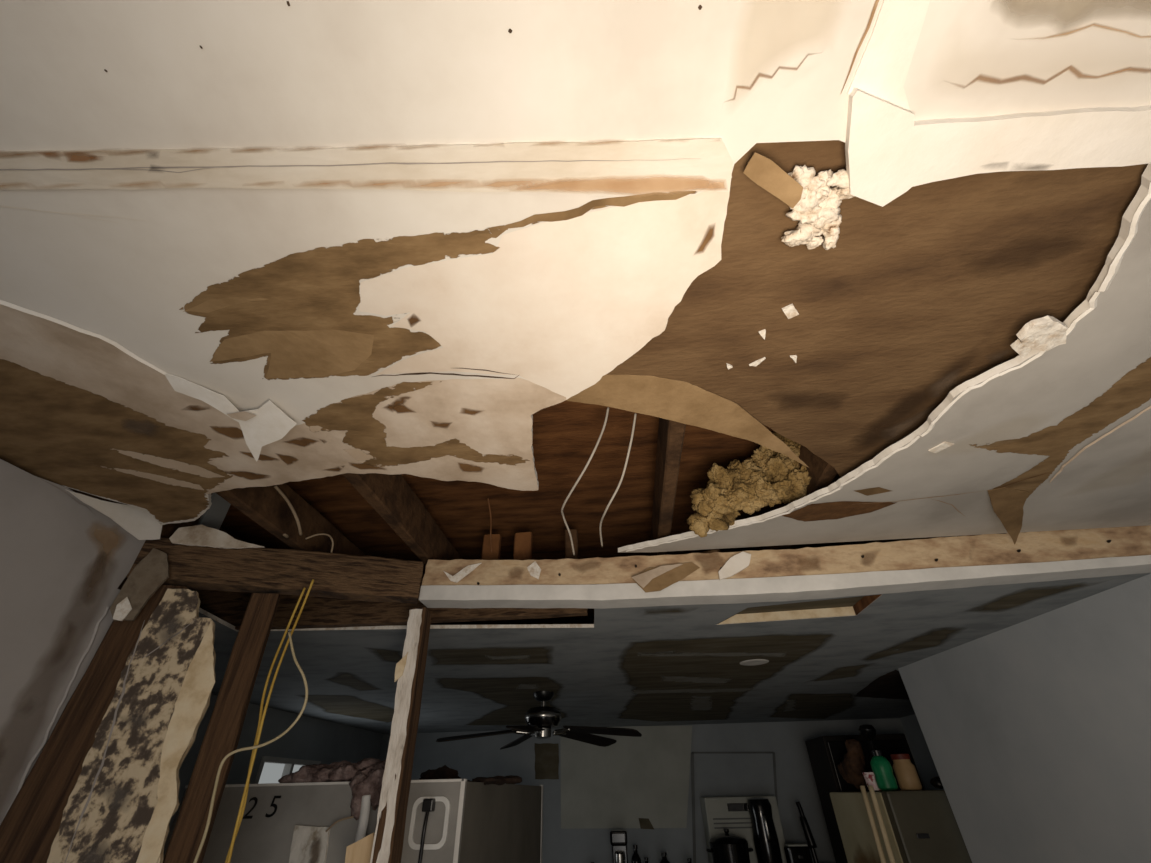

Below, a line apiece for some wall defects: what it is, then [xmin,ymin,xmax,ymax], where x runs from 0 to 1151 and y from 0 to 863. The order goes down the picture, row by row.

flaking render [781,165,855,250]
peeling [0,191,730,494]
peeling [782,303,799,319]
flaking render [1010,315,1068,358]
peeling [928,441,954,453]
peeling [974,584,1085,611]
peeling [619,634,833,722]
peeling [770,628,961,719]
peeling [301,609,566,863]